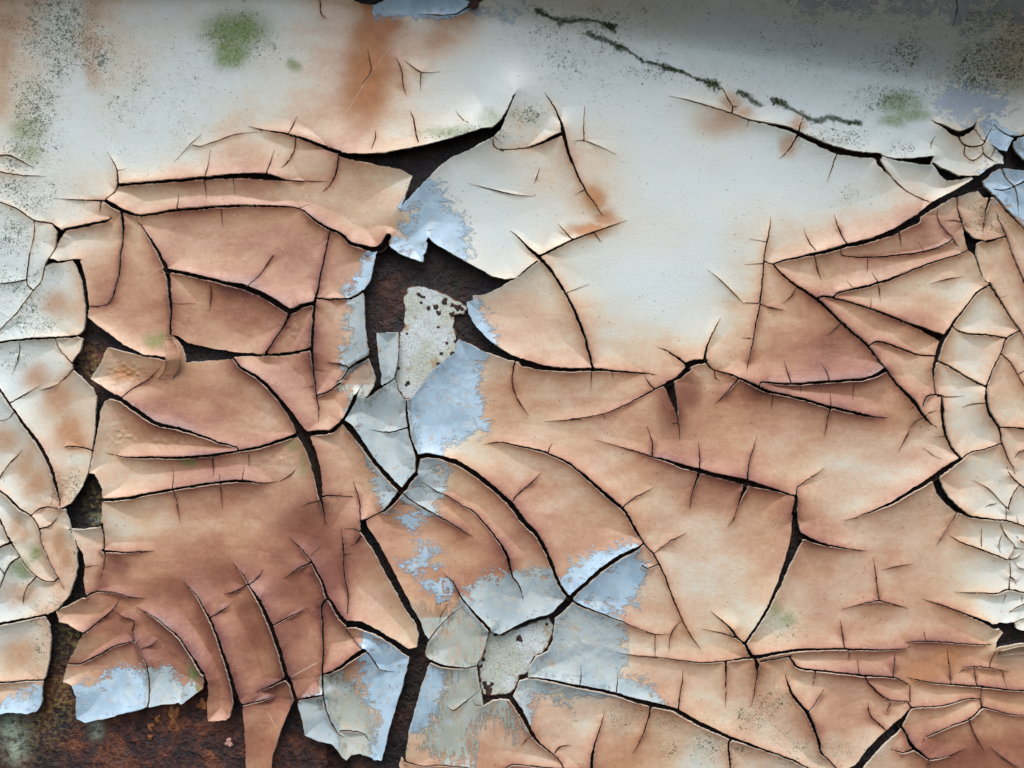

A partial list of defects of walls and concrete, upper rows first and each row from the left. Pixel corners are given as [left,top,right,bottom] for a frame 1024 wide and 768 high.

crack [396,58,431,142]
water stain [533,5,722,93]
water stain [736,90,863,126]
crack [493,88,1024,623]
peeling [0,94,666,768]
crack [0,117,700,740]
crack [616,532,1024,768]
crack [405,759,468,768]
crack [506,695,570,768]
crack [530,665,809,768]